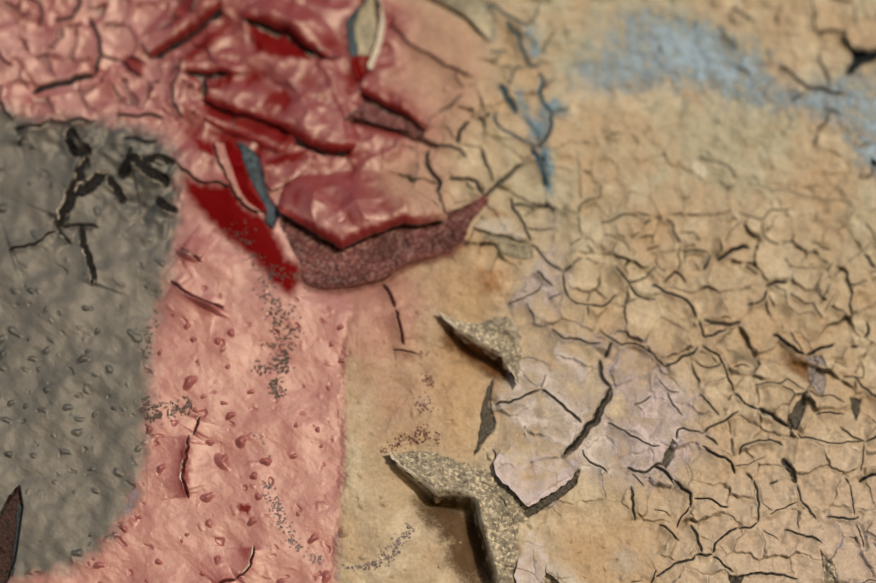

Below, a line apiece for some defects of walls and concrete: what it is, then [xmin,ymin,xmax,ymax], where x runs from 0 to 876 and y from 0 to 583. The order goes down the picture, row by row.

peeling [139,0,222,59]
peeling [241,0,346,59]
peeling [845,21,876,75]
crack [0,0,346,286]
peeling [171,57,533,289]
crack [171,281,223,308]
crack [349,0,876,583]
peeling [437,310,522,385]
crack [179,415,200,496]
peeling [387,380,587,583]
peeling [0,487,23,583]
crack [220,546,254,583]